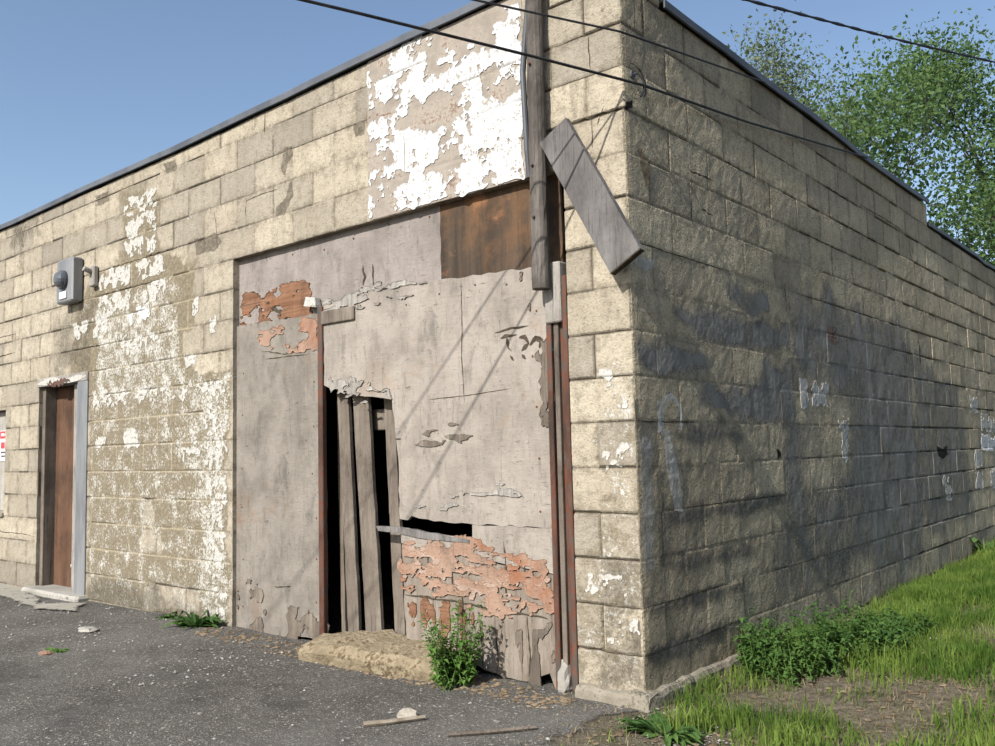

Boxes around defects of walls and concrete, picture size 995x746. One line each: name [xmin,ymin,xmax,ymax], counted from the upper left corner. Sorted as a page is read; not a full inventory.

peeling [353,0,526,220]
peeling [73,188,166,355]
spalling [194,233,221,255]
peeling [92,353,228,616]
damp [657,401,683,511]